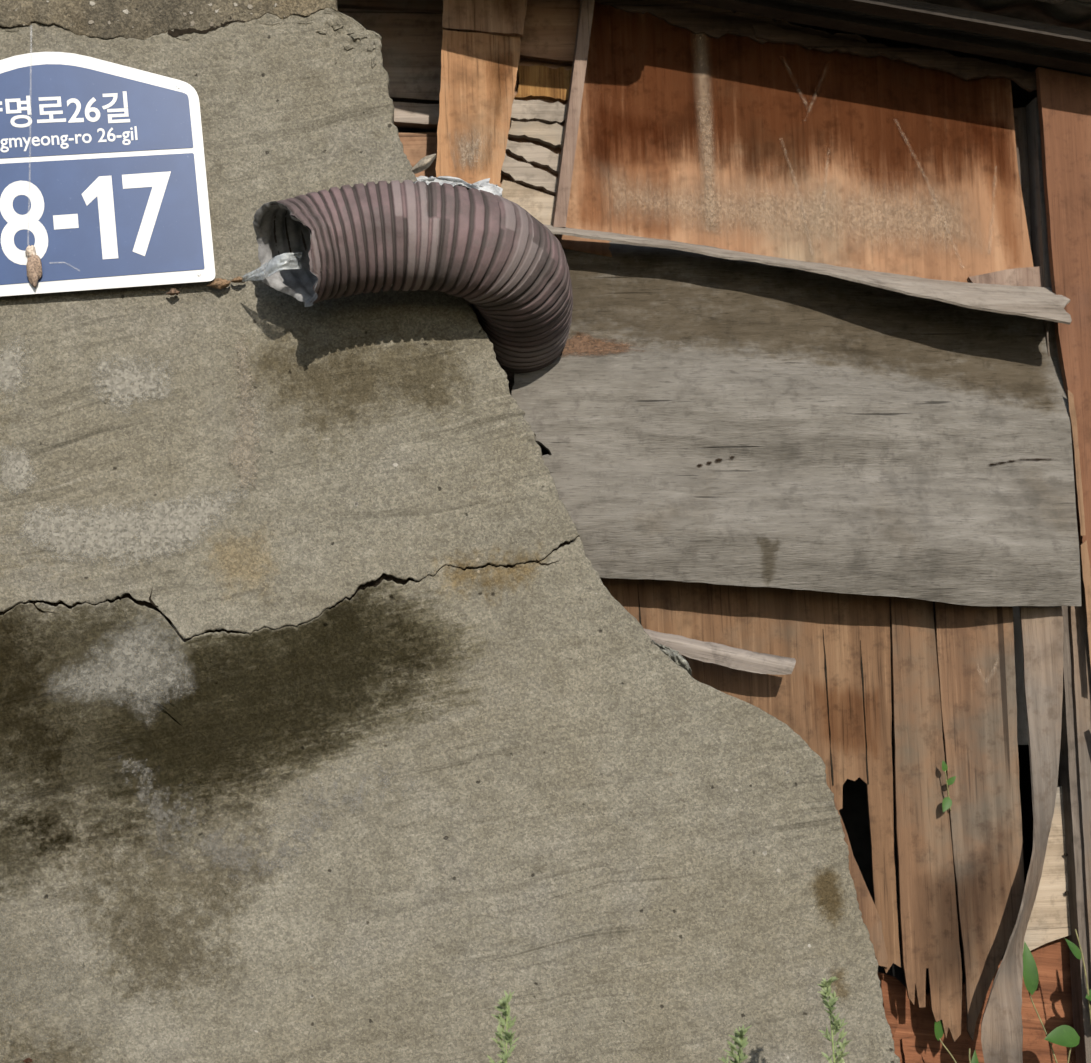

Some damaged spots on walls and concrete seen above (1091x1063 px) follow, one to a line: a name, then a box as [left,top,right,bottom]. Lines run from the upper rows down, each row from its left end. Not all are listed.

crack [168,19,314,41]
crack [0,541,572,642]
leakage [58,623,188,711]